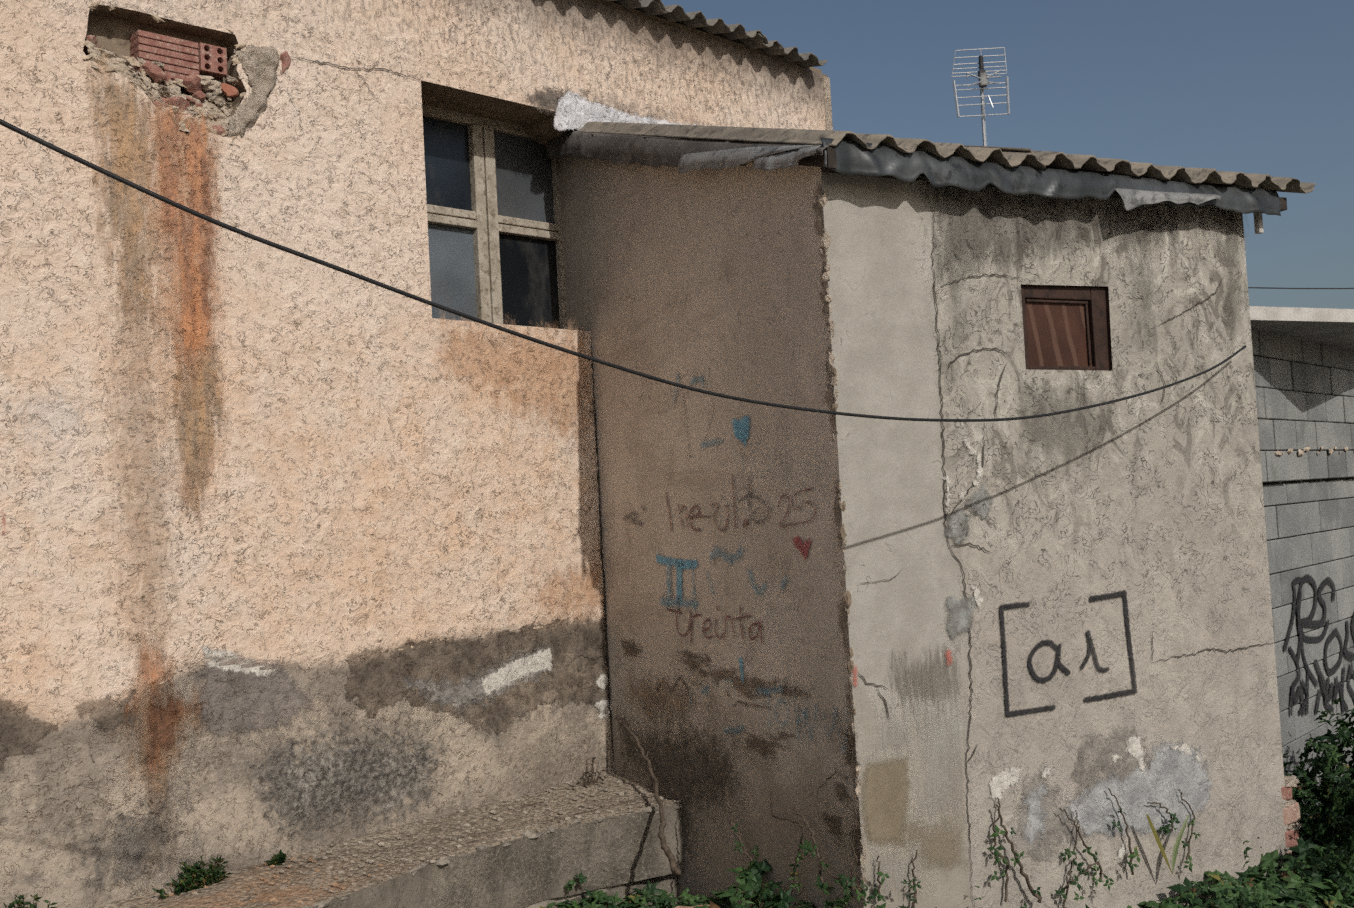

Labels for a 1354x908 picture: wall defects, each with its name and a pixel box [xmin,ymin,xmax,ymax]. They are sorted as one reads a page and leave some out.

flaking render [83,1,291,148]
corrosion [93,70,221,512]
water stain [85,805,168,882]
corrosion [127,643,200,794]
water stain [254,722,447,838]
water stain [622,640,640,656]
water stain [595,674,738,852]
water stain [681,651,805,697]
flaking render [989,728,1213,861]
crack [1151,631,1277,662]